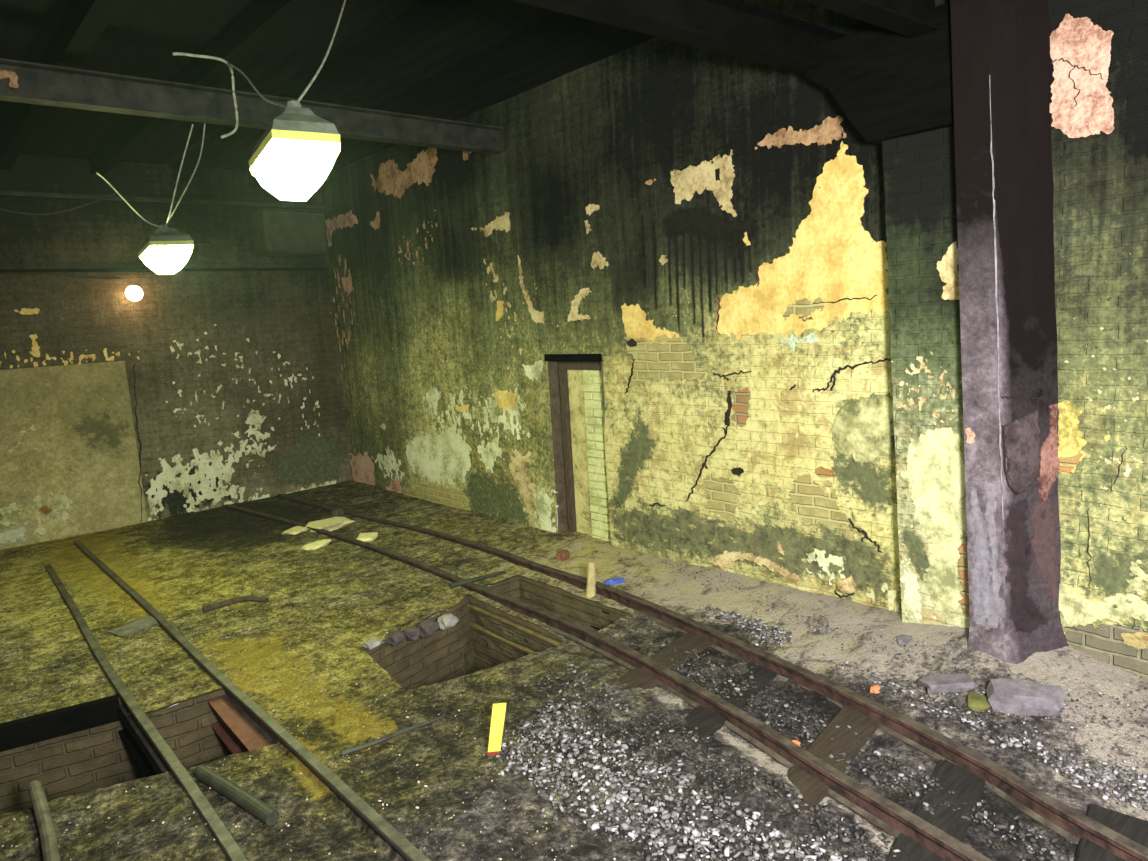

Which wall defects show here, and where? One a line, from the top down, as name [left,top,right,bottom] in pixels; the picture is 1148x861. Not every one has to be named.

flaking render [1050,14,1115,138]
flaking render [370,147,438,198]
leakage [641,215,751,338]
flaking render [670,150,737,217]
flaking render [715,115,889,340]
flaking render [937,241,960,300]
flaking render [0,334,139,368]
flaking render [621,303,711,393]
crack [790,358,891,393]
leakage [406,384,558,532]
crack [649,370,751,507]